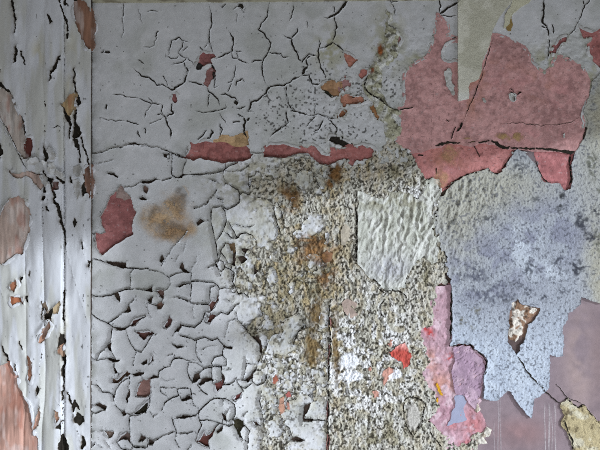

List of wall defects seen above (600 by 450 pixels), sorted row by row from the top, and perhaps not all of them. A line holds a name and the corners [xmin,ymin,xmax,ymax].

peeling [70,0,98,52]
crack [99,1,349,140]
crack [352,70,414,111]
peeling [396,13,591,192]
crack [418,36,581,190]
peeling [575,23,600,72]
water stain [142,200,195,240]
peeling [0,87,379,450]
crack [352,191,360,264]
crack [325,300,333,450]
peeling [388,339,412,369]
flaking render [421,285,600,450]